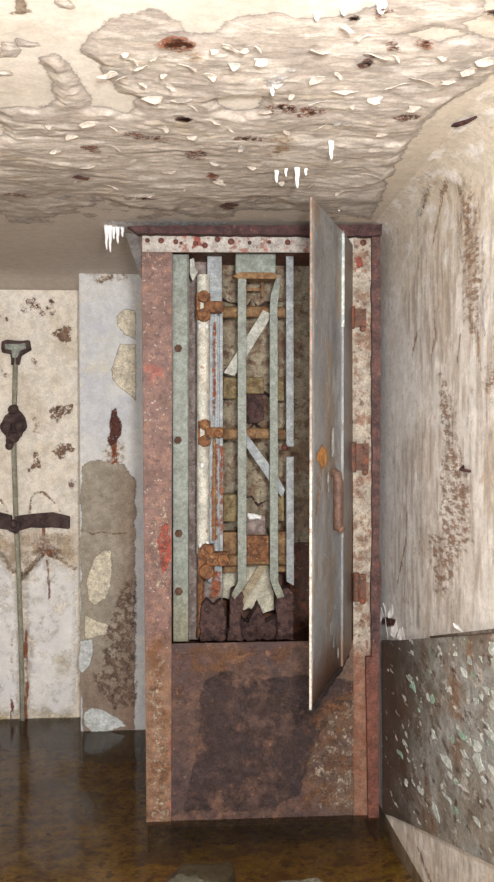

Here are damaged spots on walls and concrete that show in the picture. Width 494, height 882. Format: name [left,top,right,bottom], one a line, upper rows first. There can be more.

corrosion [155,36,202,62]
spalling [0,0,494,224]
spalling [52,326,71,342]
spalling [49,404,73,422]
corrosion [105,408,124,464]
spalling [51,443,75,459]
spalling [69,460,137,733]